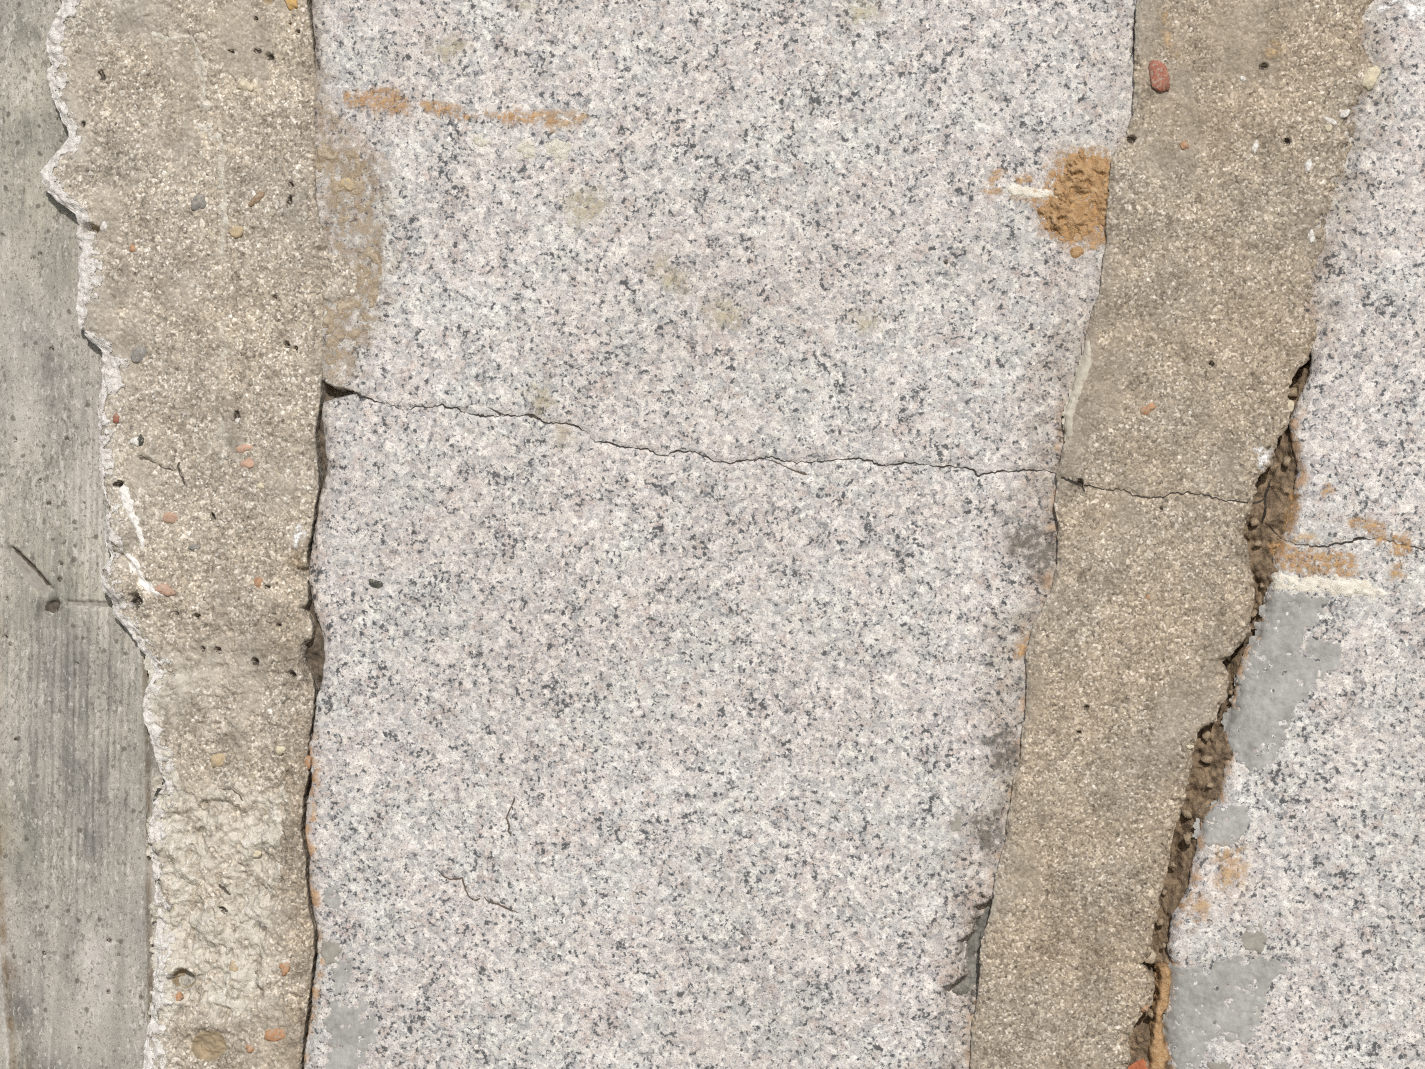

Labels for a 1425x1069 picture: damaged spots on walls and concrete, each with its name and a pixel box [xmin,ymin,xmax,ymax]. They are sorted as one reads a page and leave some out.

spalling [40,0,289,1069]
crack [327,387,1425,550]